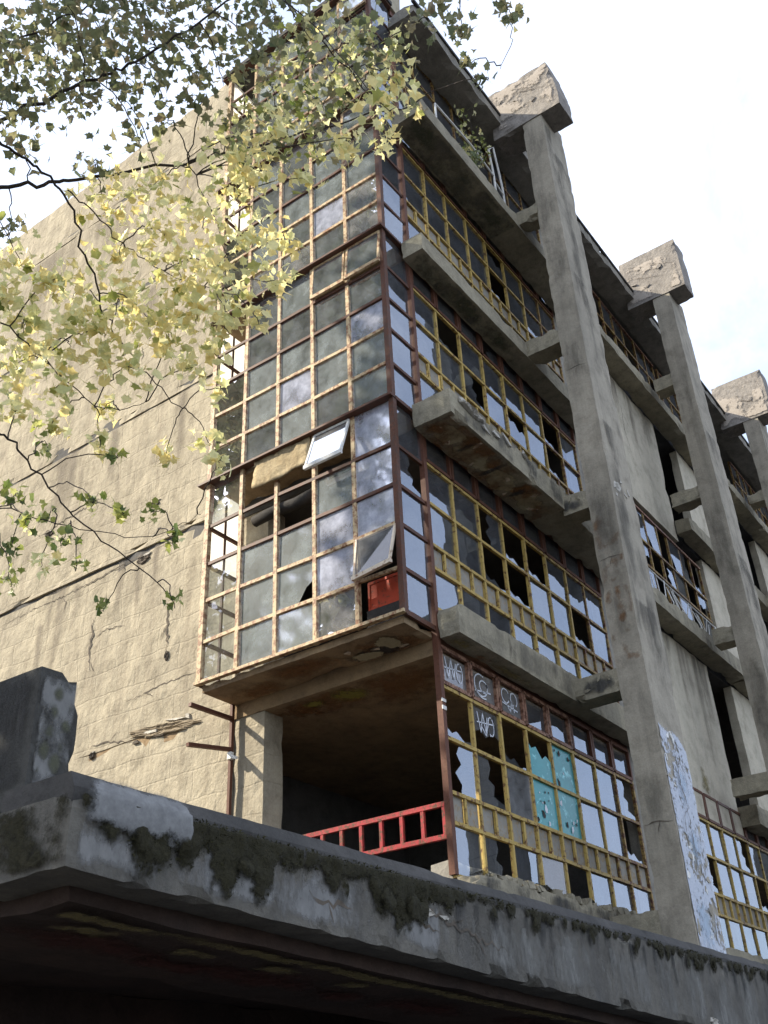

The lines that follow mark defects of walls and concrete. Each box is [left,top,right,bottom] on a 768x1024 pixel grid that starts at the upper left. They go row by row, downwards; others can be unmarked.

crack [88,616,123,671]
crack [161,610,169,651]
peeling [344,637,409,661]
crack [128,672,196,701]
spalling [129,713,203,744]
damp [79,831,157,873]
peeling [658,722,727,954]
damp [198,855,352,924]
damp [59,912,151,935]
damp [405,911,440,950]
damp [173,938,590,1023]